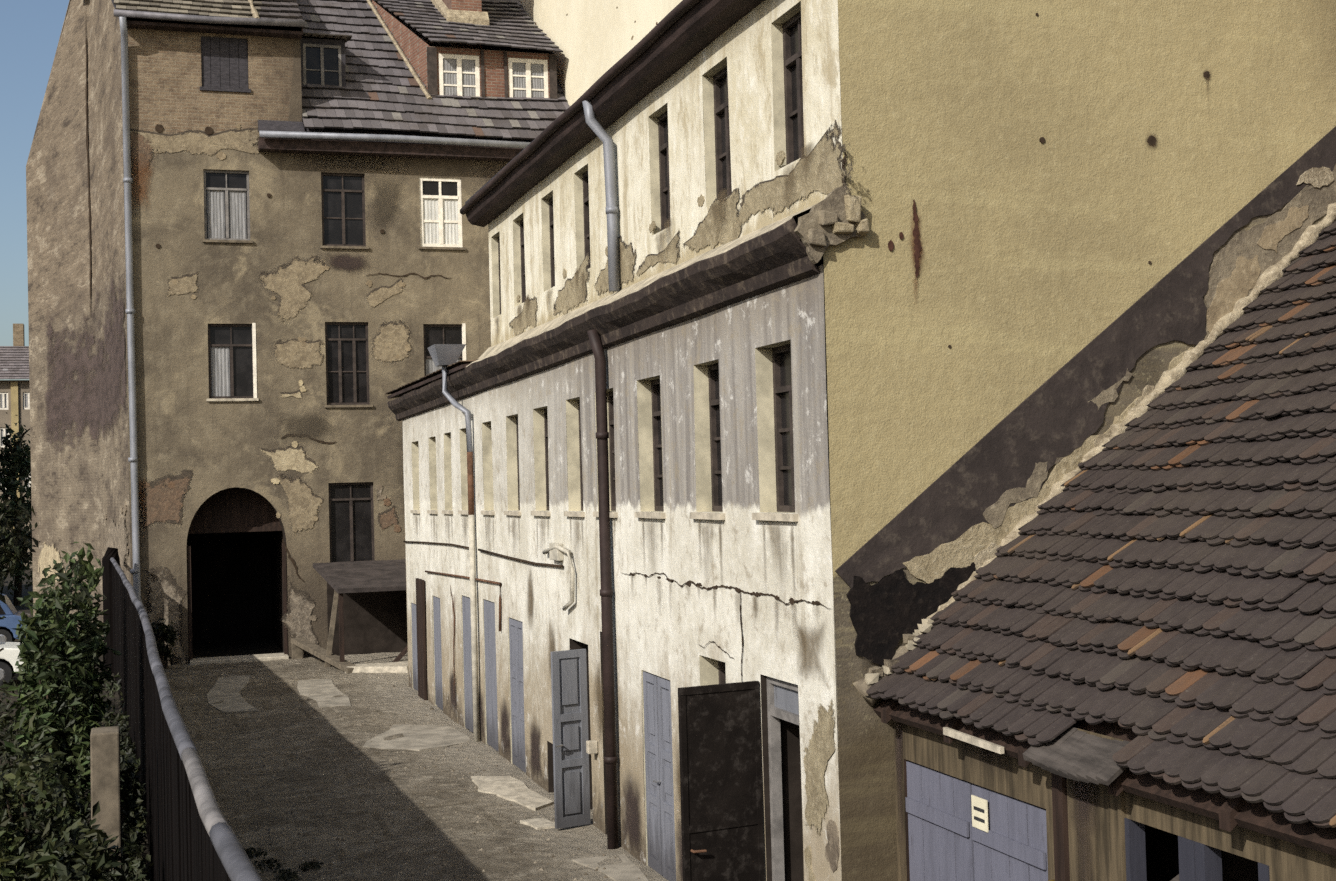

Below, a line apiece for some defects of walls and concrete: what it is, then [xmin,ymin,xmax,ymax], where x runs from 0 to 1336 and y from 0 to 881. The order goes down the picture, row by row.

flaking render [121,124,262,174]
damp [45,273,126,451]
flaking render [257,255,330,321]
flaking render [372,320,411,363]
flaking render [509,295,538,336]
flaking render [553,119,869,315]
flaking render [1168,164,1336,370]
flaking render [103,469,193,569]
flaking render [261,441,324,535]
flaking render [903,368,1154,584]
crack [623,572,832,681]
peeling [803,698,840,881]